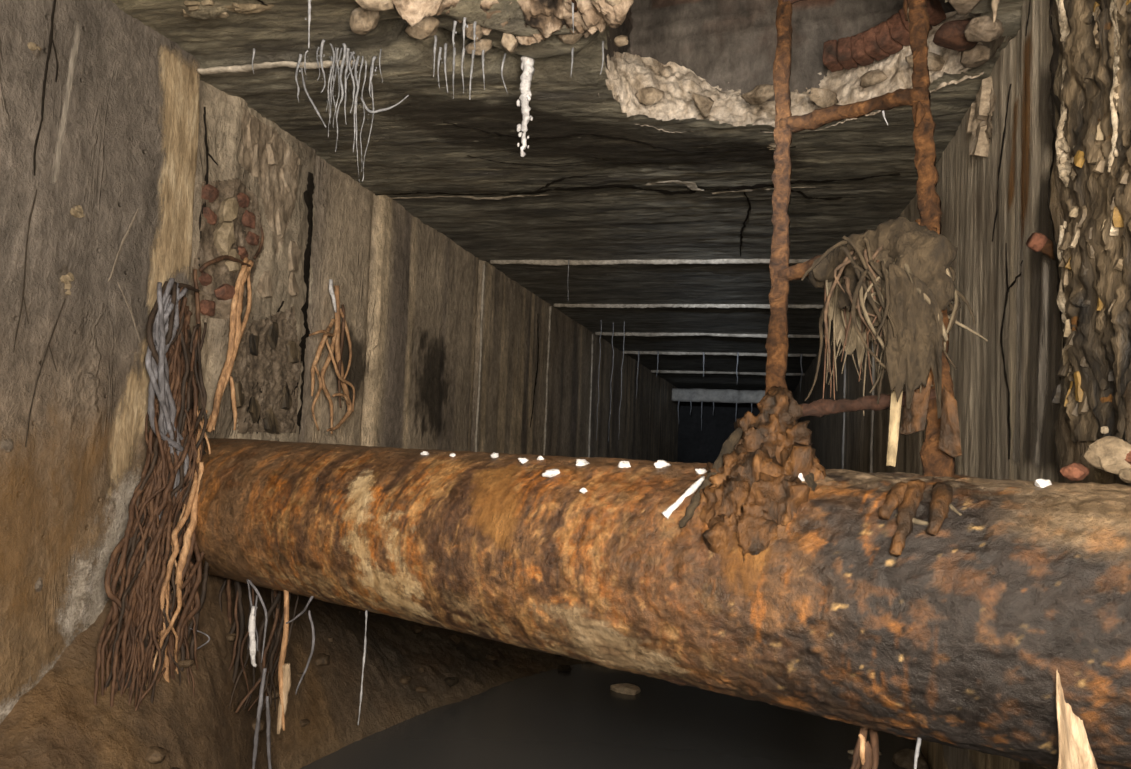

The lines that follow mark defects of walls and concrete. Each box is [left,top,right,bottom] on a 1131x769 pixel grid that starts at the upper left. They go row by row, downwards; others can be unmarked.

spalling [349,0,776,150]
spalling [790,46,913,131]
spalling [927,11,997,157]
water stain [392,95,775,169]
crack [375,121,900,256]
rust [476,466,517,543]
rust [731,531,765,579]